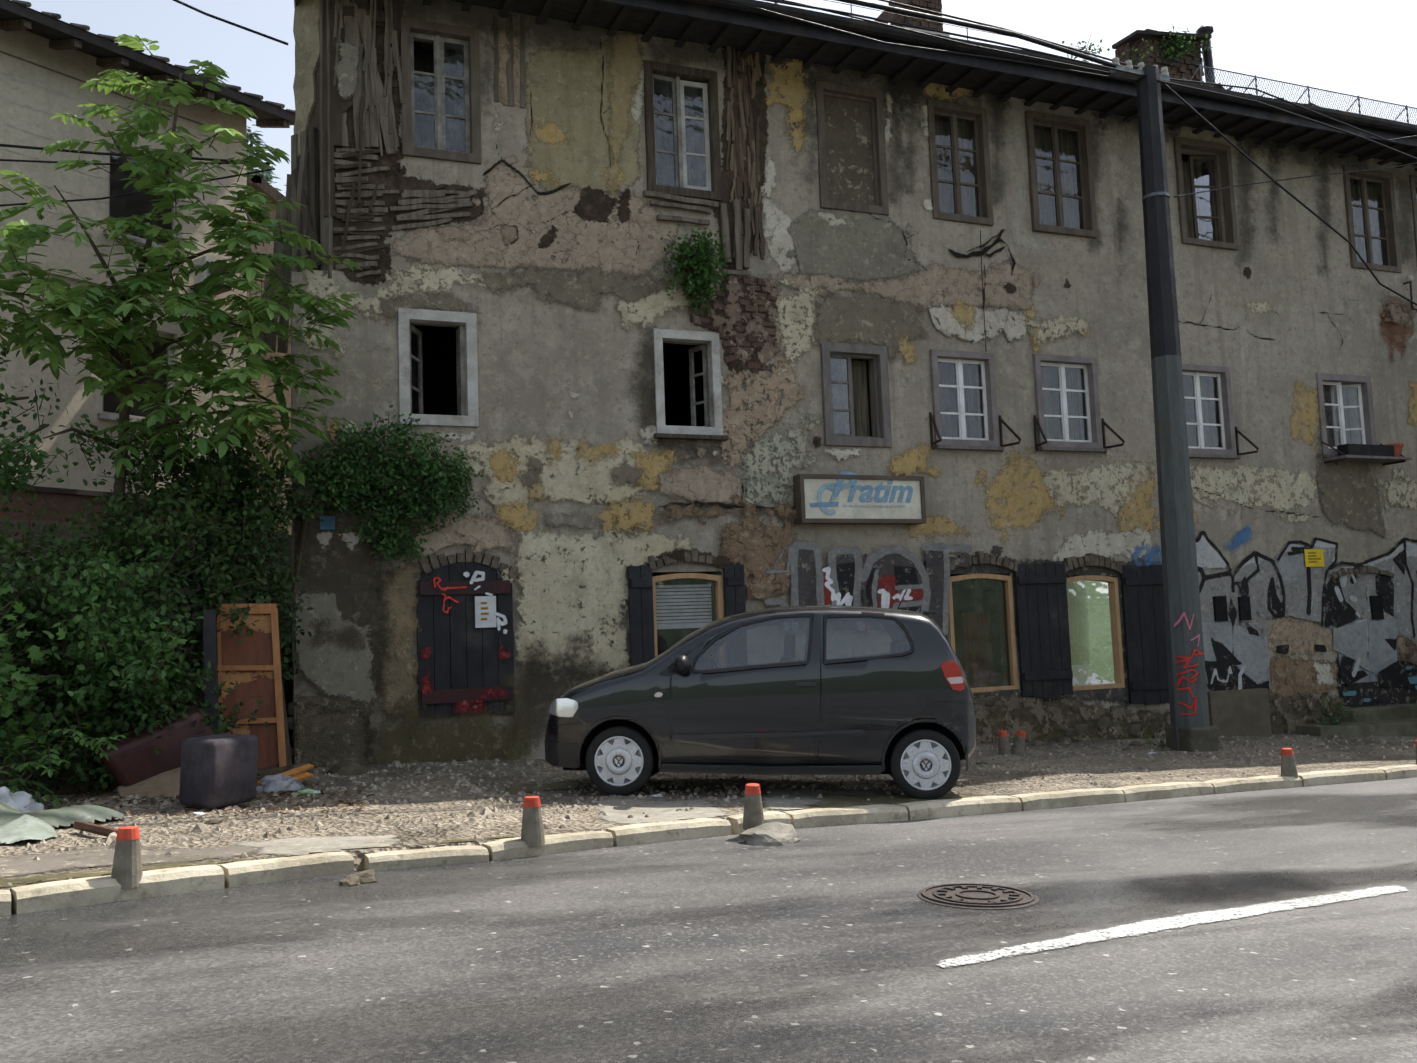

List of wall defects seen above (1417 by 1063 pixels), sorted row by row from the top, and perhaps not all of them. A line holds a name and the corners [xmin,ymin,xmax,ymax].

crack [483,142,570,244]
crack [870,213,1016,305]
rust [1381,321,1412,362]
flaking render [287,30,1092,767]
peeling [1289,380,1320,451]
leakage [294,504,391,694]
flaking render [906,447,1171,744]